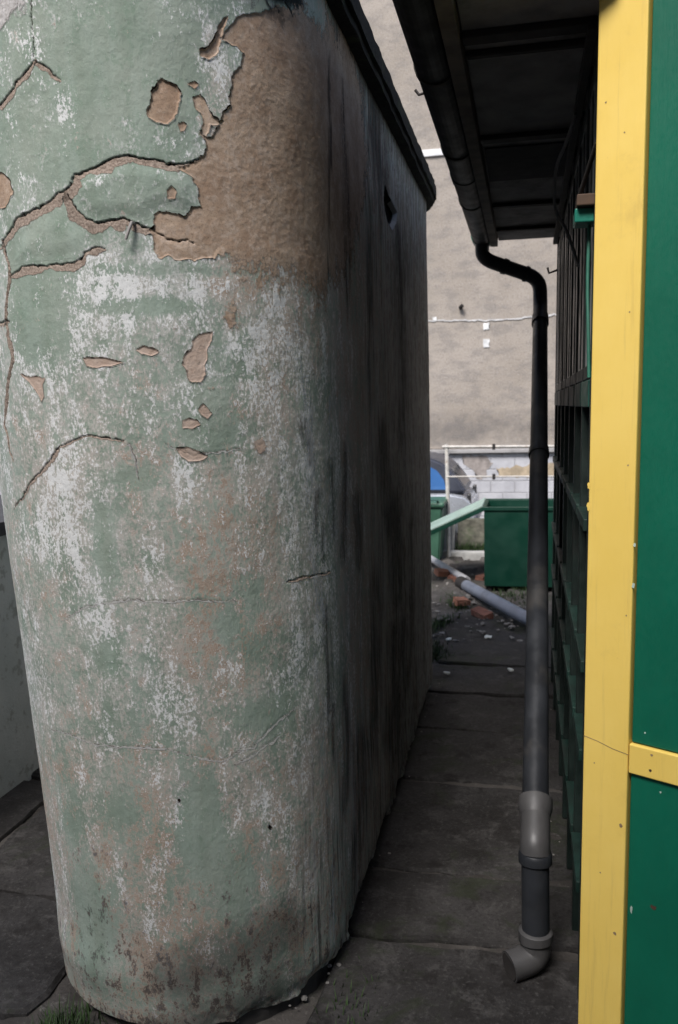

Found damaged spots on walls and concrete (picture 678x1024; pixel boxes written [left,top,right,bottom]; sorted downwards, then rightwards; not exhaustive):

peeling [0,0,27,29]
peeling [0,172,13,209]
crack [0,155,199,462]
peeling [83,356,122,368]
peeling [135,345,158,356]
peeling [181,332,214,389]
peeling [20,373,45,402]
peeling [182,403,212,429]
peeling [176,446,208,462]
crack [6,435,139,509]